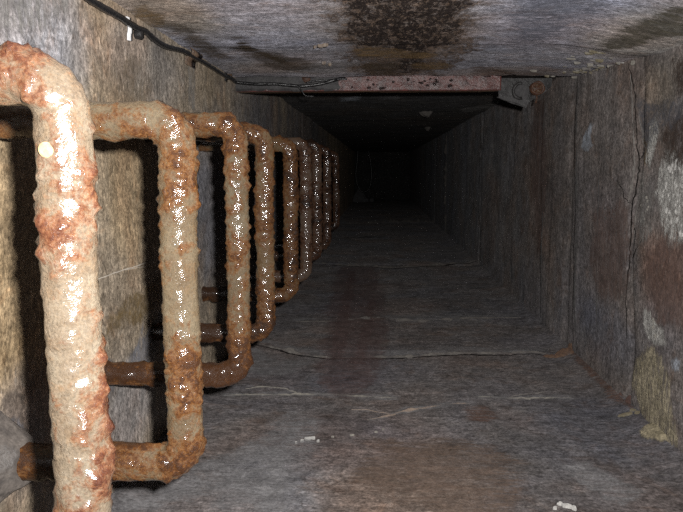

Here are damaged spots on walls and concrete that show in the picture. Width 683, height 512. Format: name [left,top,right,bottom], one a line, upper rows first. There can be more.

crack [616,64,645,339]
leakage [632,347,679,447]